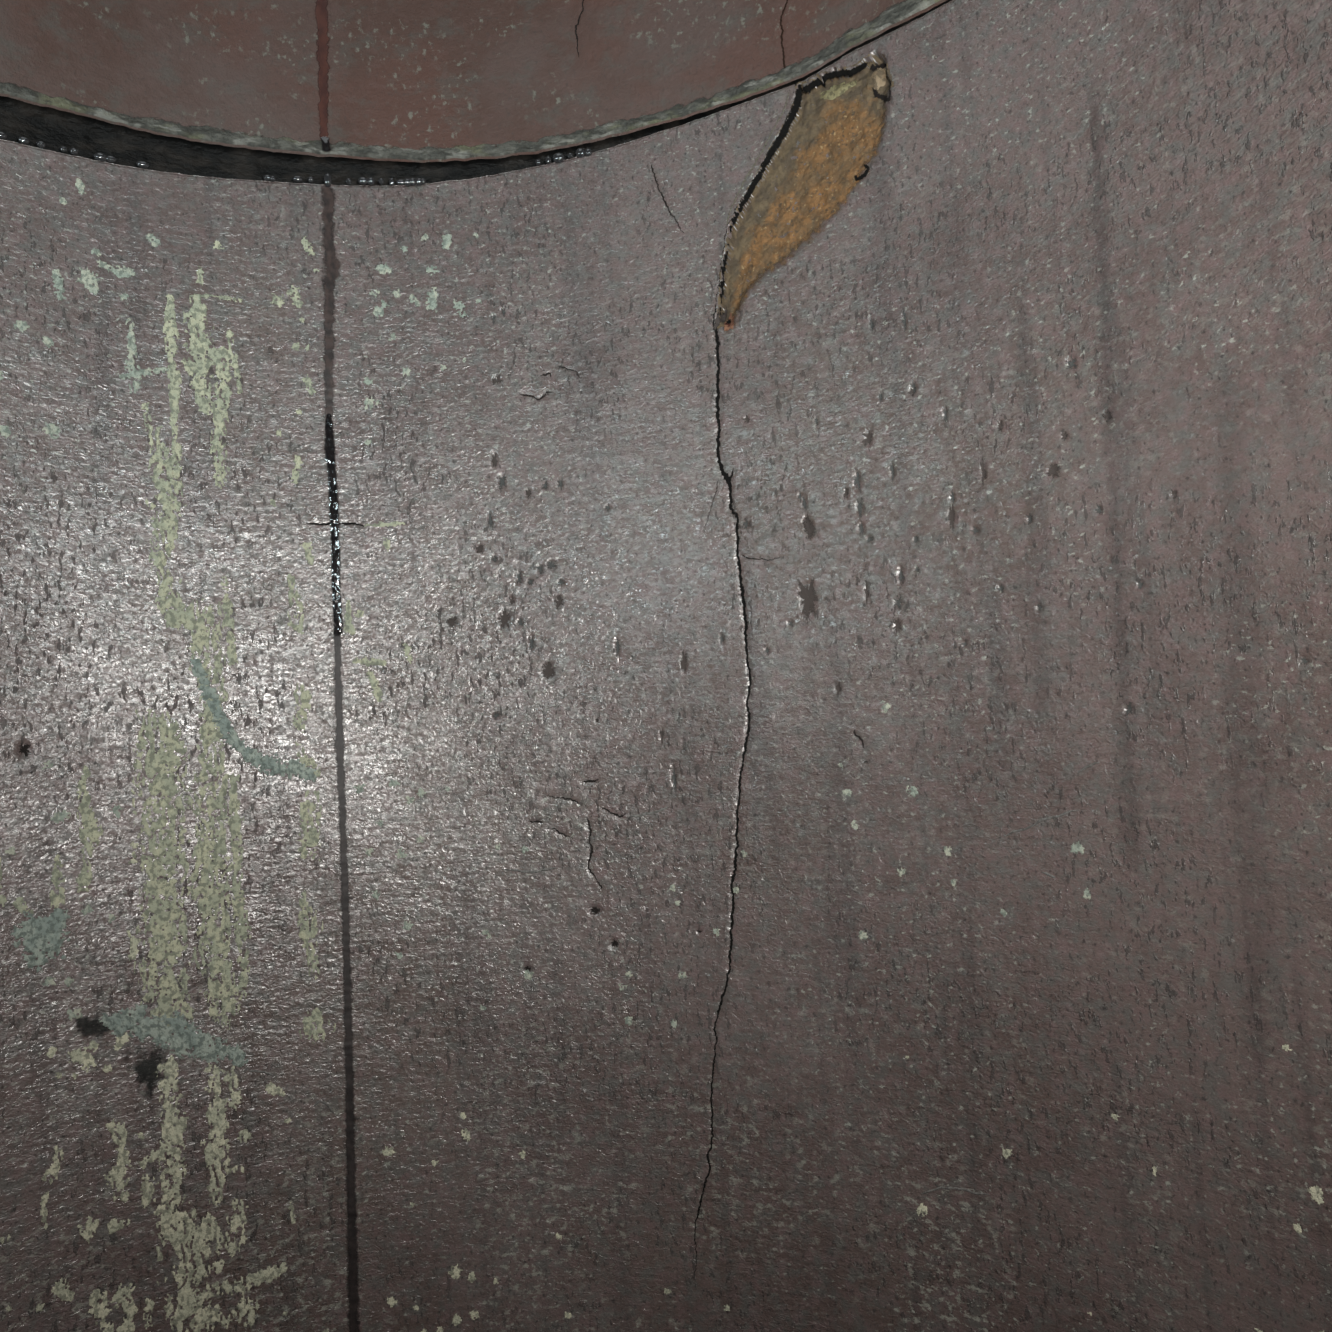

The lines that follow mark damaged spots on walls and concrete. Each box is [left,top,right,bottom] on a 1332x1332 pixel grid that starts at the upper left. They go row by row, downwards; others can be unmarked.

crack [575,0,584,57]
crack [780,0,788,68]
spalling [713,54,894,331]
leakage [119,293,252,1030]
leakage [49,765,104,908]
crack [694,312,780,1275]
leakage [76,1017,109,1036]
leakage [40,1145,64,1230]
leakage [77,1216,130,1244]
leakage [88,1046,287,1332]